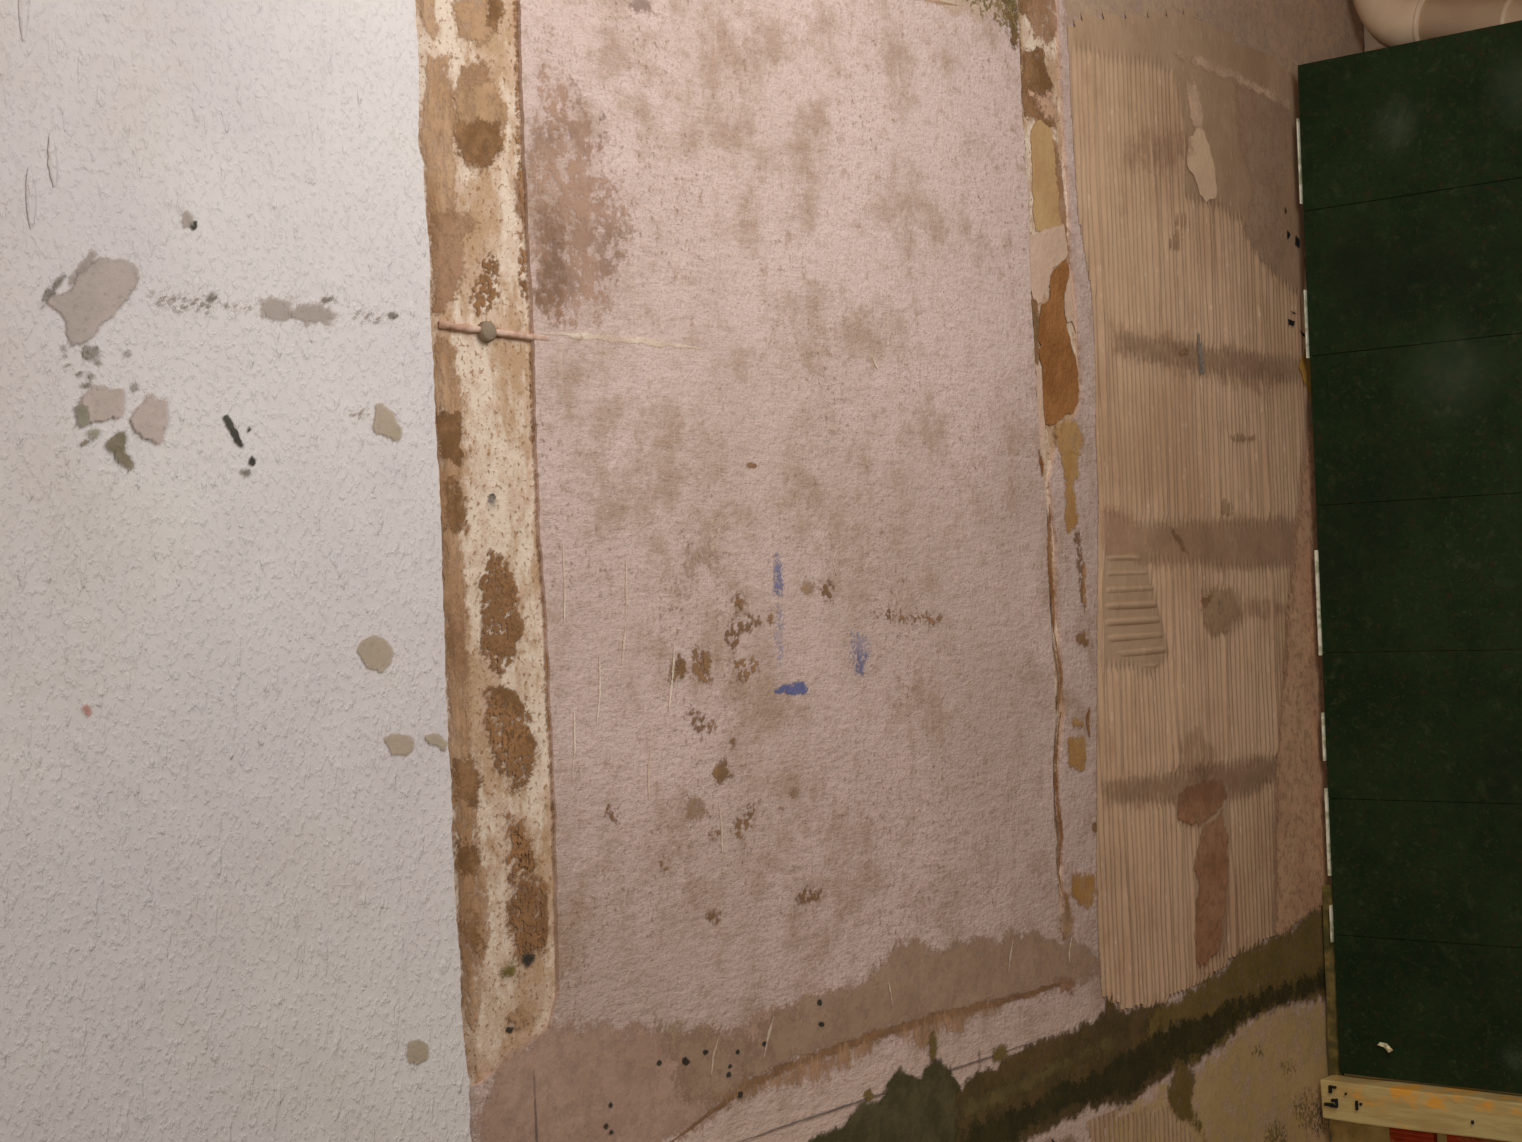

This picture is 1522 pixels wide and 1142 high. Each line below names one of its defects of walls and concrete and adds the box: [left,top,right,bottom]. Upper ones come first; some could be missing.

peeling [43,250,169,471]
flaking render [1031,260,1079,457]
damp [500,954,535,978]
damp [808,904,1343,1142]